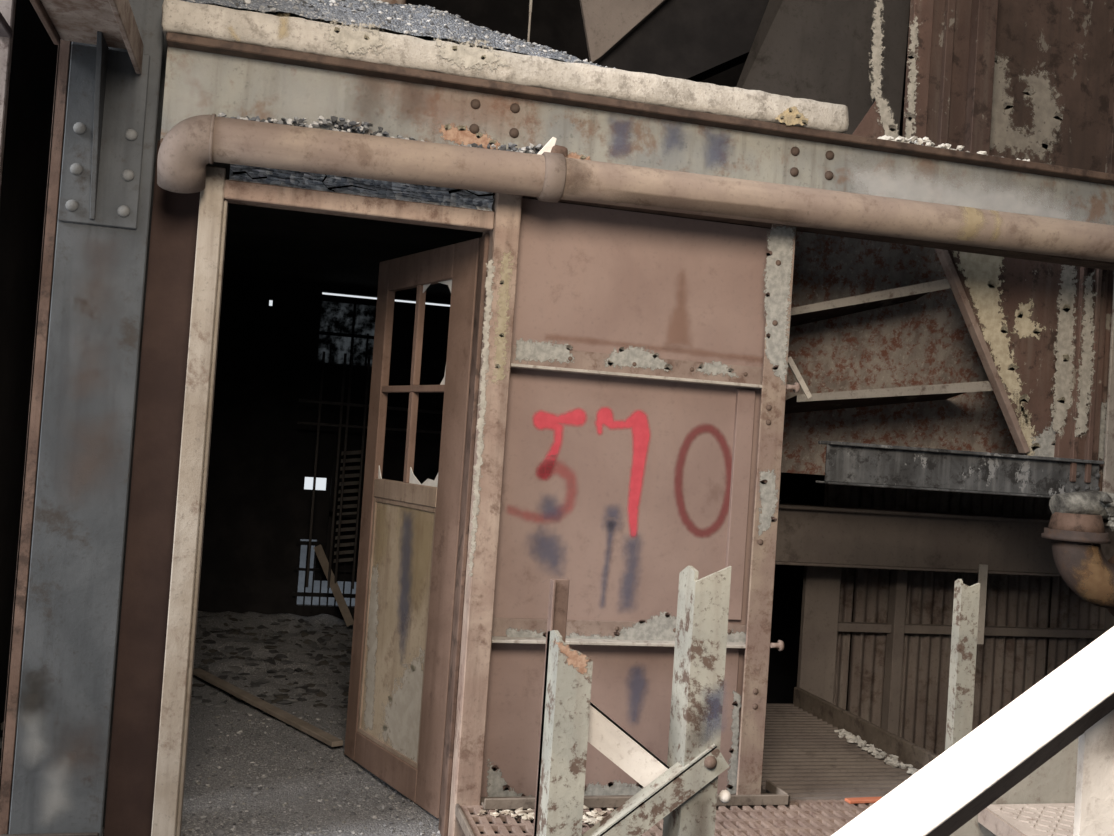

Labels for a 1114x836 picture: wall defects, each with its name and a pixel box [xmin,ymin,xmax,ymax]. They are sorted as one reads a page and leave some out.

peeling [869,0,920,143]
peeling [990,51,1064,164]
peeling [603,345,673,372]
peeling [695,360,739,378]
peeling [762,225,797,384]
peeling [951,251,1107,461]
peeling [757,469,778,537]
rust [1075,544,1114,605]
peeling [364,564,425,763]
rust [556,642,589,678]